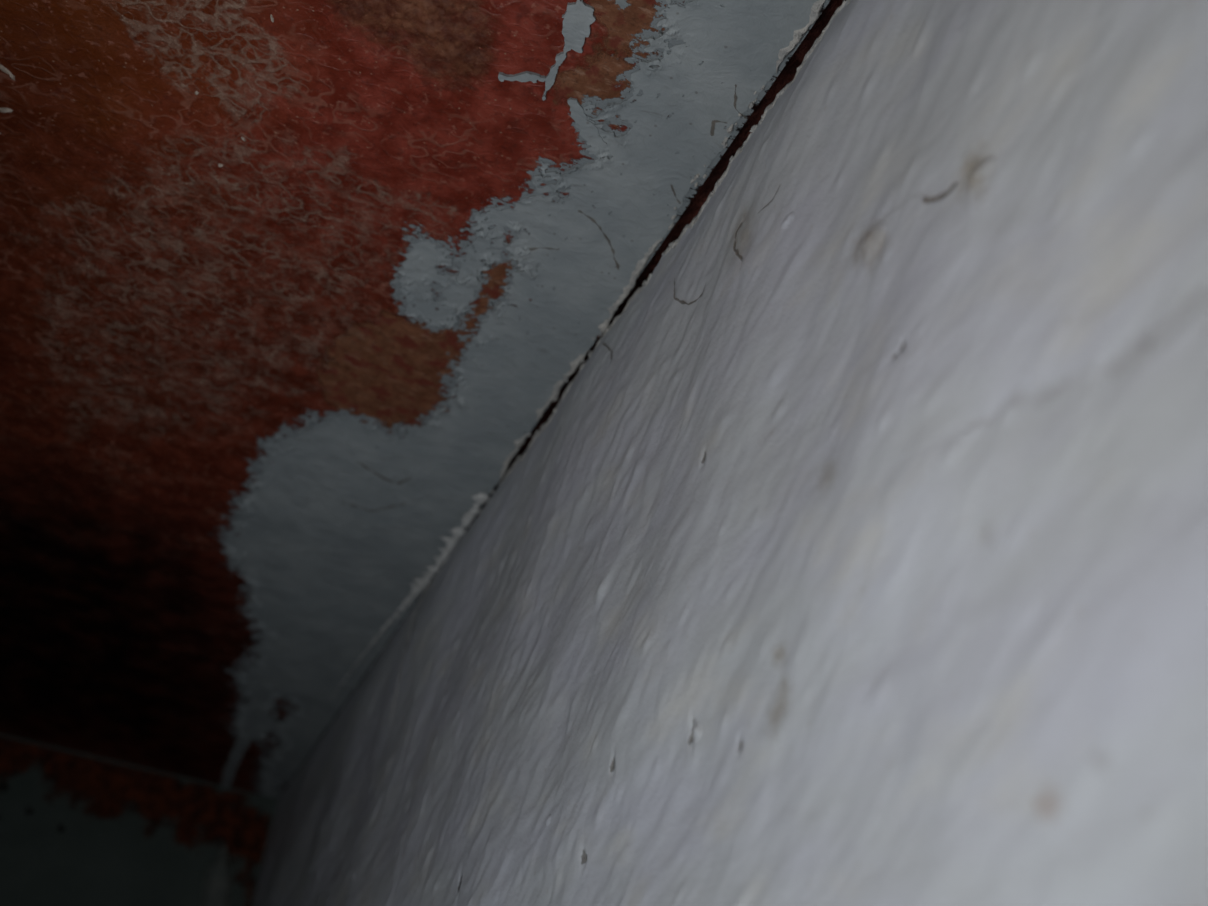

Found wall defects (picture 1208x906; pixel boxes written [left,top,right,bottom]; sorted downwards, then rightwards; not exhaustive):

peeling [210,0,830,799]
crack [331,0,850,720]